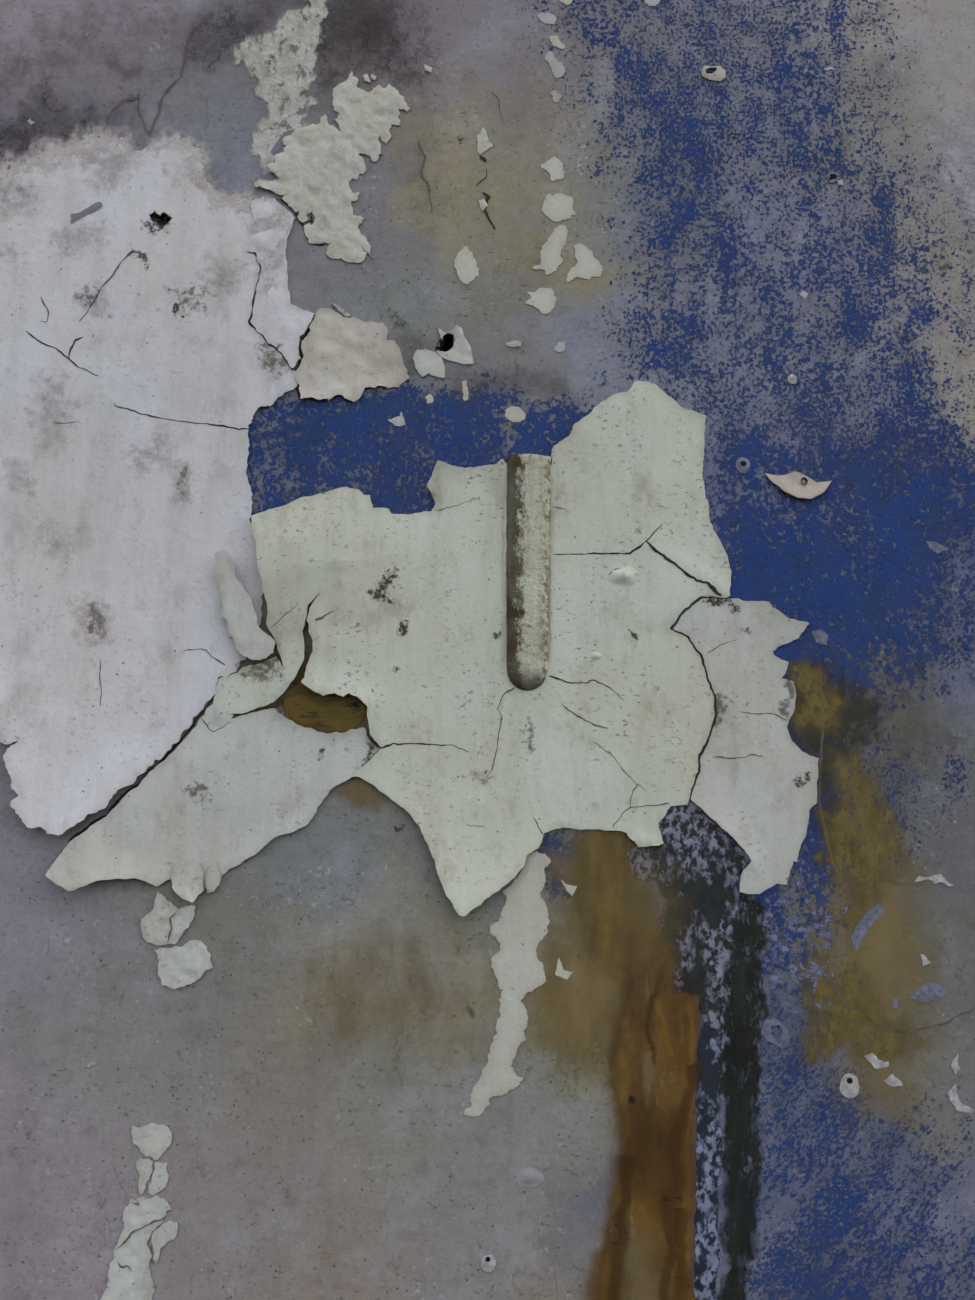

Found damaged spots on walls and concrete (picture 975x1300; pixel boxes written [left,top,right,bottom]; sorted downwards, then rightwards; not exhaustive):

leakage [301,2,428,78]
crack [26,251,148,376]
crack [248,252,315,400]
crack [113,403,249,430]
crack [550,527,786,827]
leakage [780,665,878,813]
rust [788,663,928,1102]
peeling [555,959,573,980]
rust [536,830,700,1300]
leakage [627,801,854,1300]
flaking render [864,1053,889,1069]
peeling [101,1123,178,1300]